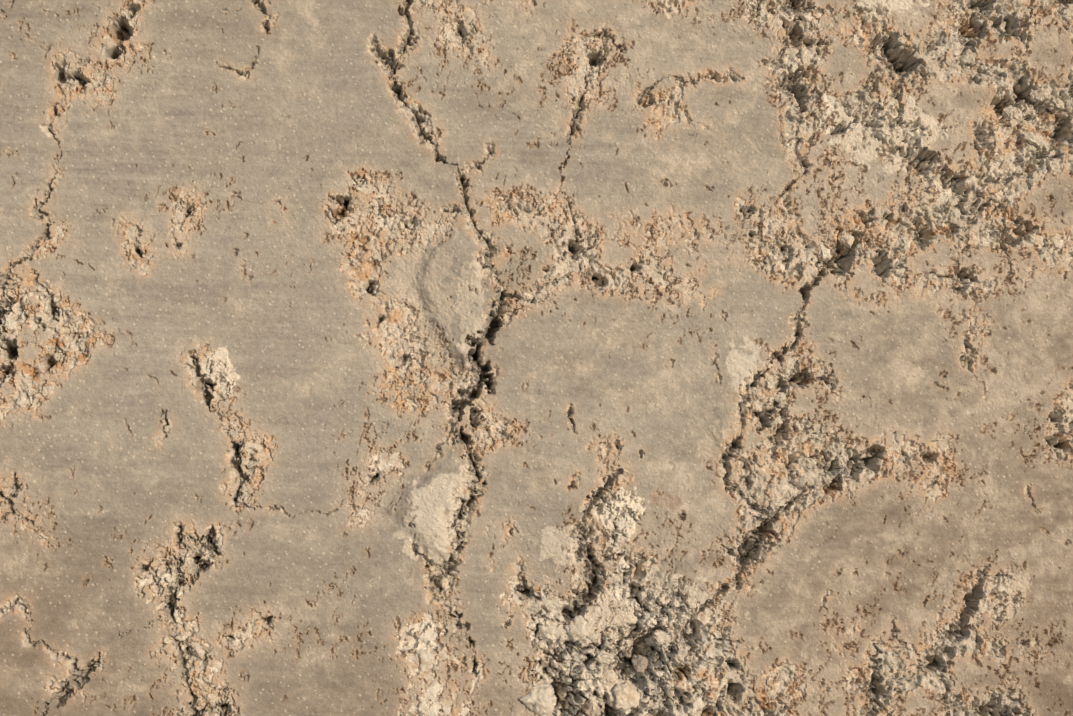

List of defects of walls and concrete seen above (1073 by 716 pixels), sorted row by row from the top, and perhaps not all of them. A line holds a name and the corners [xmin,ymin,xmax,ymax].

crack [218,0,272,79]
spalling [734,0,1073,315]
spalling [0,270,115,421]
crack [157,409,170,441]
crack [189,354,215,413]
spalling [324,169,468,415]
spalling [464,401,521,452]
crack [370,0,628,676]
crack [636,0,839,650]
crack [0,432,344,716]
spalling [501,502,807,716]
spalling [845,577,1055,716]